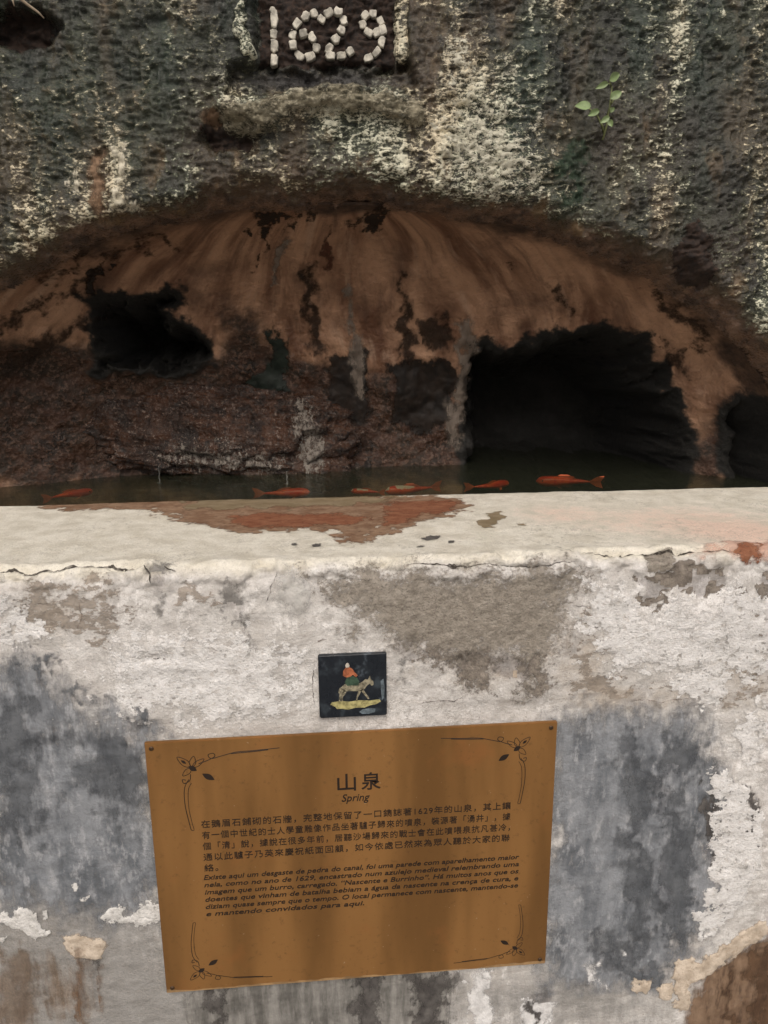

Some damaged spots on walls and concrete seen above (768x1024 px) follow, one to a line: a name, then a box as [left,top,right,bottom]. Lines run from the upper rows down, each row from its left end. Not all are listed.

corrosion [38,494,506,544]
crack [0,564,174,584]
crack [408,547,731,569]
flaking render [298,547,768,766]
leakage [0,646,158,930]
leakage [741,785,760,851]
peeling [0,906,51,942]
peeling [100,900,160,927]
leakage [519,707,731,1024]
peeling [631,765,768,1012]